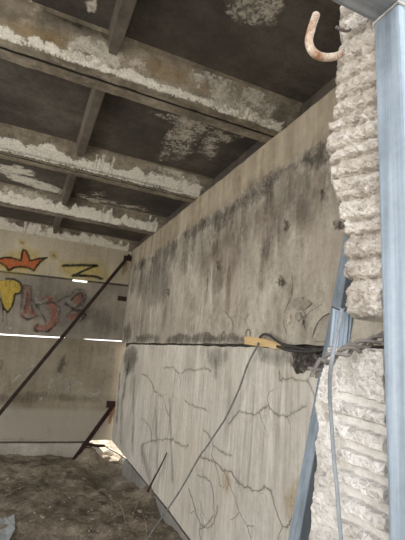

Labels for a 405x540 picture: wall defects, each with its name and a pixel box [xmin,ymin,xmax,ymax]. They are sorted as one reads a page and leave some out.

water stain [227,0,284,25]
water stain [0,25,284,132]
water stain [0,111,244,198]
water stain [0,164,158,232]
water stain [0,217,130,251]
spalling [290,348,323,374]
crack [228,393,311,427]
crack [188,431,292,540]